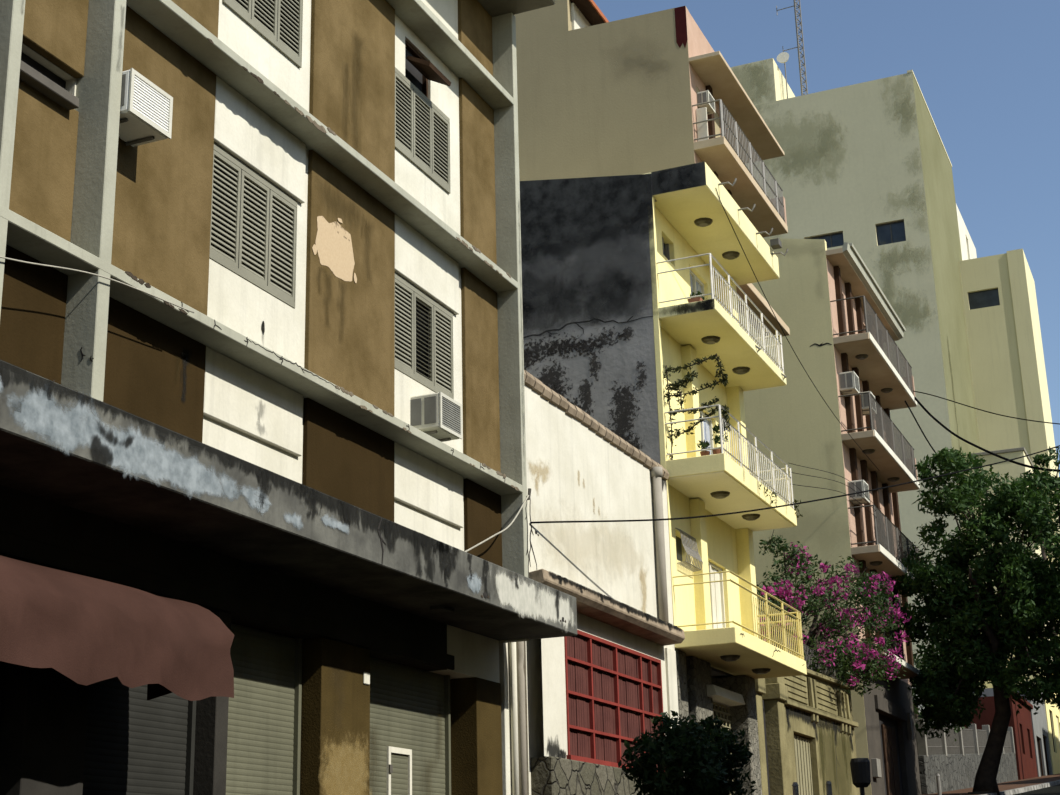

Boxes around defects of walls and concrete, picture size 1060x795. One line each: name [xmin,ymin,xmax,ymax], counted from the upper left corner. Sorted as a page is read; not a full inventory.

peeling [312,216,357,283]
crack [523,316,653,338]
damp [520,161,706,335]
damp [0,359,489,597]